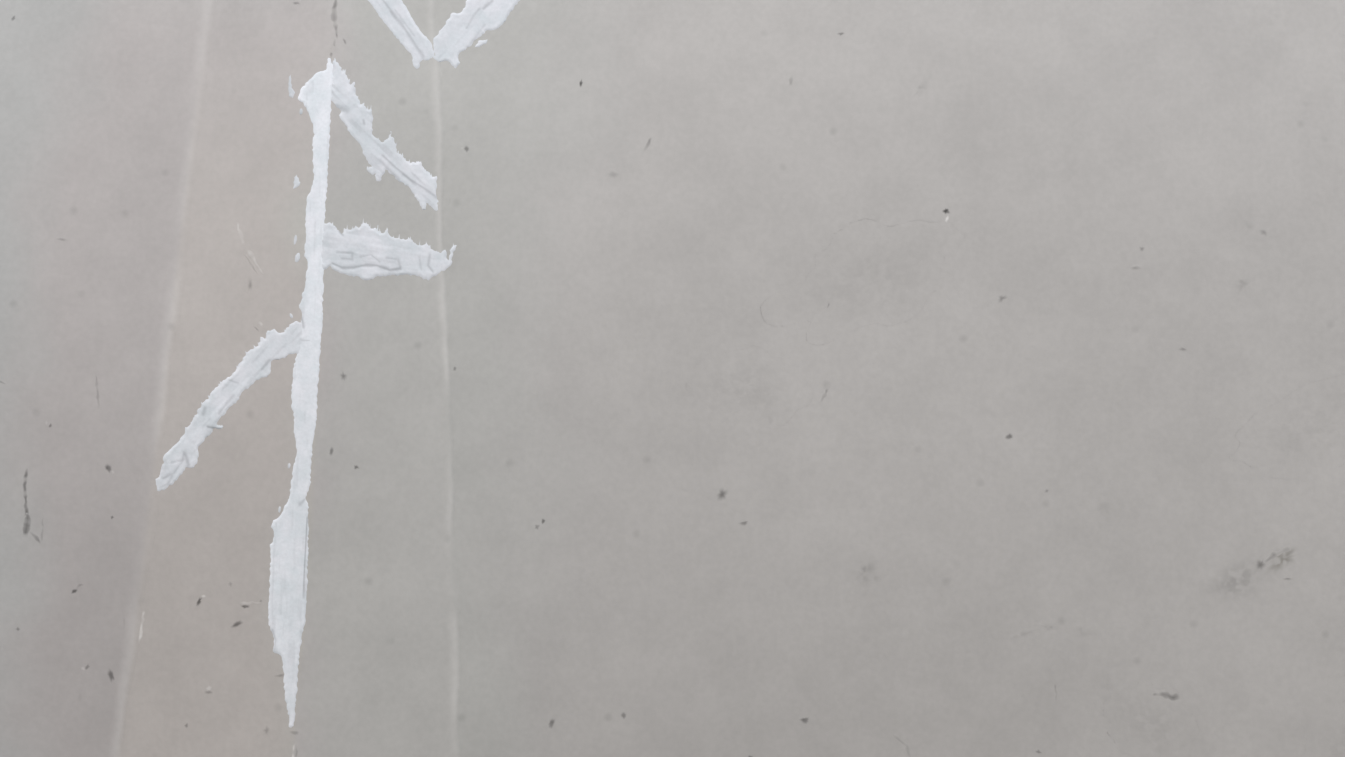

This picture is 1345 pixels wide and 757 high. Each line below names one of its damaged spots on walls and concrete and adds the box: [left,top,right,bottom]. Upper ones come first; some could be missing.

peeling [368,0,520,69]
peeling [155,58,457,757]